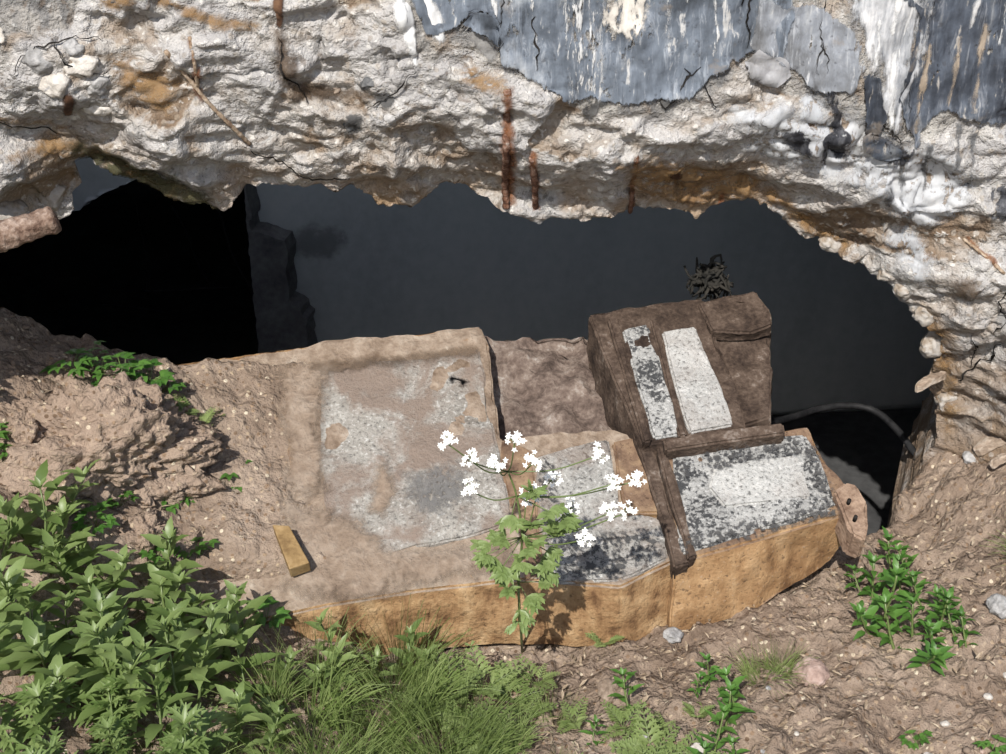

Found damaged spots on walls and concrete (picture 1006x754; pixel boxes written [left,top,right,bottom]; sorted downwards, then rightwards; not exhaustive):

crack [14,35,107,77]
rust [273,0,297,83]
crack [278,38,308,102]
crack [367,72,416,109]
peeling [412,0,1006,161]
crack [741,0,755,60]
crack [251,151,350,181]
rust [465,68,516,204]
spalling [501,112,510,210]
spalling [529,156,539,210]
rust [618,157,847,247]
crack [958,293,1006,381]